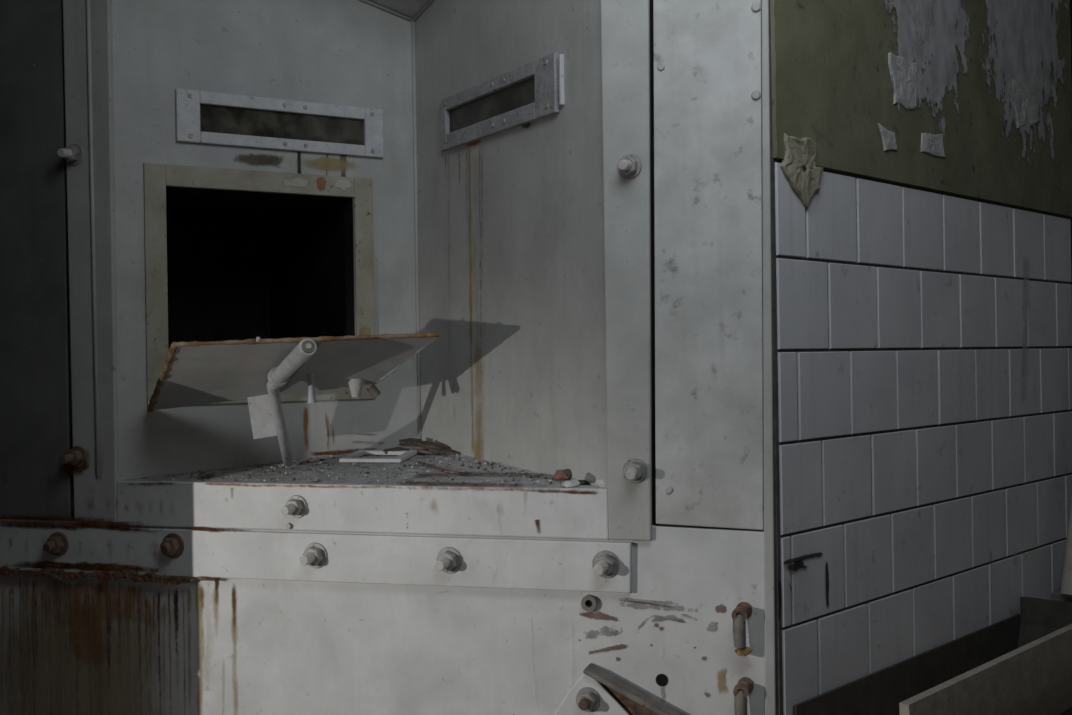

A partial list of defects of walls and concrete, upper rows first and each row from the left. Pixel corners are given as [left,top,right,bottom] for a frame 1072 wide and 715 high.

peeling [878,123,897,151]
peeling [884,0,1069,161]
corrosion [459,140,481,459]
corrosion [196,576,221,703]